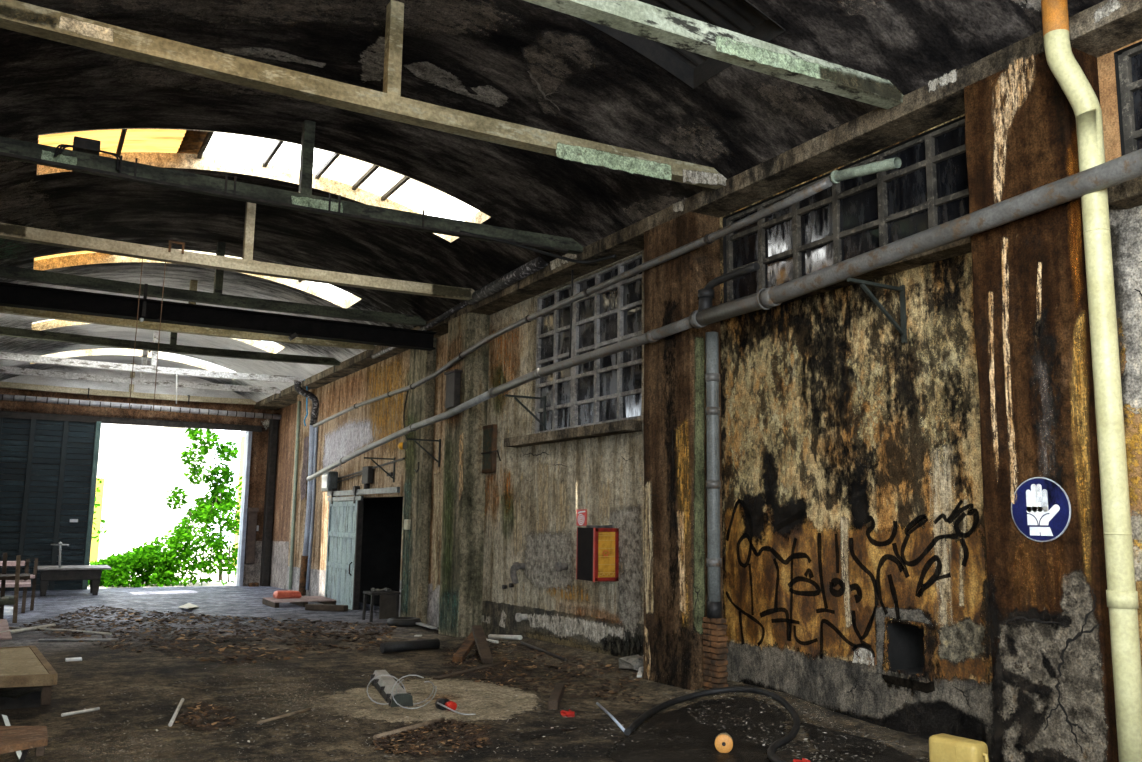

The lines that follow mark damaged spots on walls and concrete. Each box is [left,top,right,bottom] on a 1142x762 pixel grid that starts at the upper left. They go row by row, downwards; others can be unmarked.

peeling [59,0,522,107]
peeling [523,31,595,115]
peeling [1011,0,1042,16]
peeling [1094,0,1120,23]
peeling [992,54,1034,203]
flaking render [1108,204,1142,422]
water stain [720,237,1077,762]
flaking render [1131,511,1142,583]
spalling [853,569,1108,762]